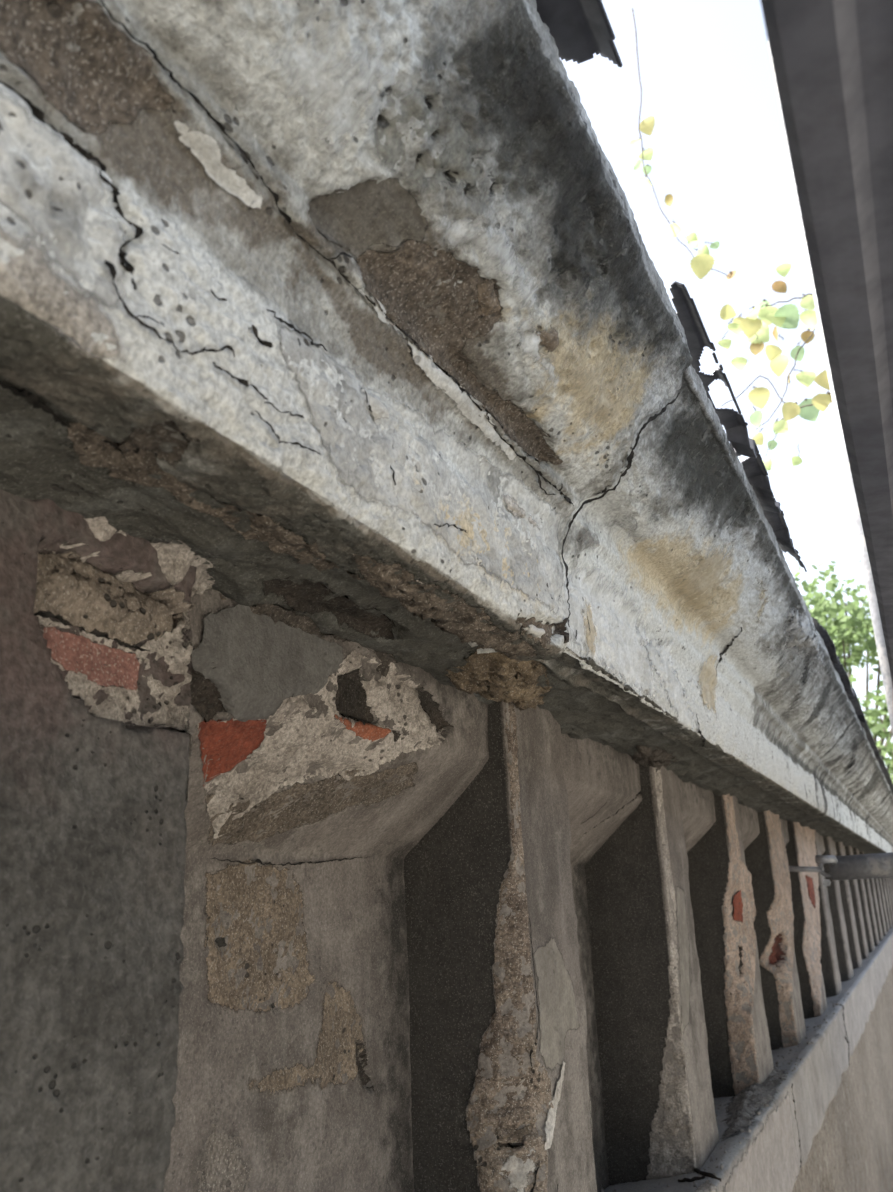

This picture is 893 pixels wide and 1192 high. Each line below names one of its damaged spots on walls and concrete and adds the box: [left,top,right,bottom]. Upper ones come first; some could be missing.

peeling [0,94,125,358]
peeling [0,0,263,209]
crack [0,81,327,459]
crack [100,0,679,640]
spalling [308,85,563,465]
leakage [446,221,536,306]
leakage [517,321,558,383]
peeling [34,325,579,1192]
crack [696,713,706,747]
flaking render [722,794,822,1094]
crack [791,1084,802,1167]